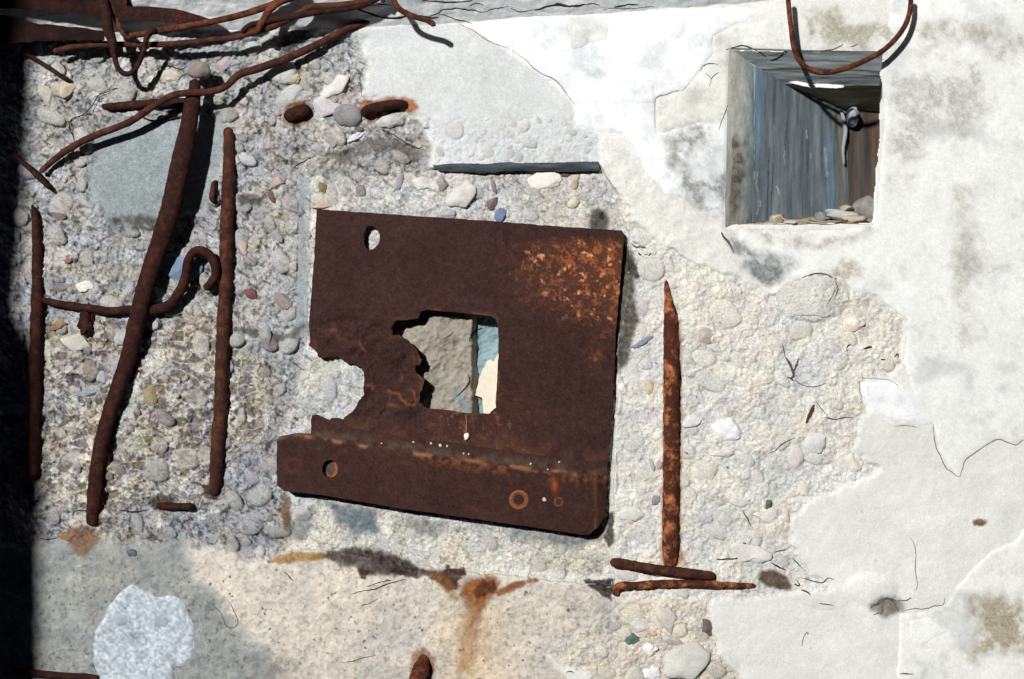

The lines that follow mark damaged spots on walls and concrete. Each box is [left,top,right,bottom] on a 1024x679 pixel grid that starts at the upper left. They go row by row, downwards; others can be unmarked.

corrosion [286,101,308,125]
corrosion [360,97,417,121]
peeling [464,7,785,217]
spalling [0,32,702,586]
spalling [548,0,1024,679]
crack [900,425,1023,477]
damp [392,567,418,578]
corrosion [430,565,538,669]
corrosion [413,650,433,678]